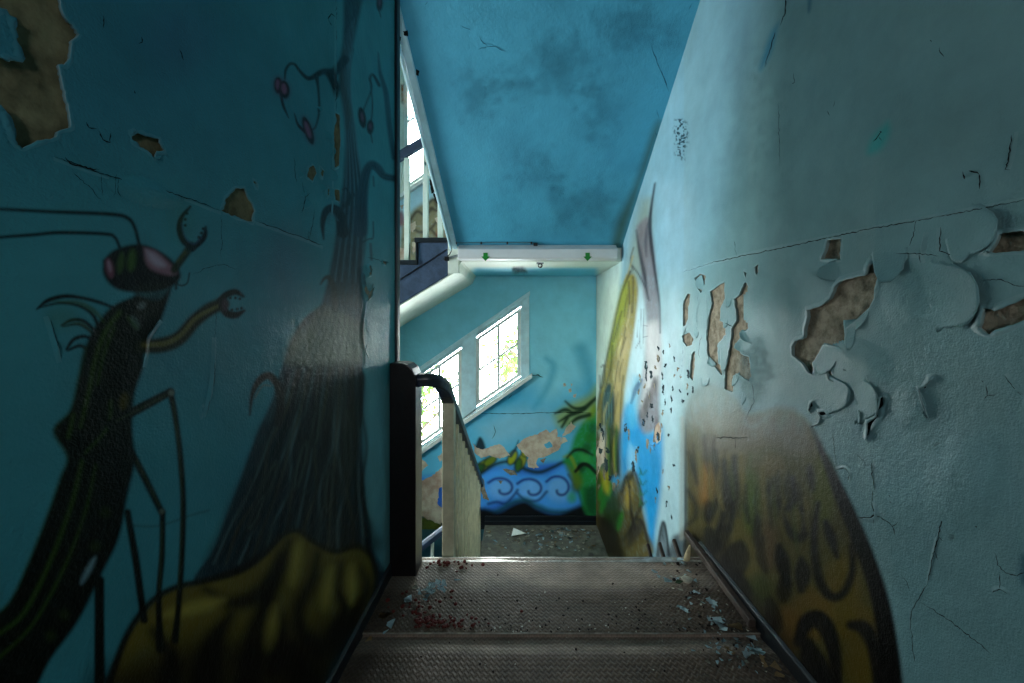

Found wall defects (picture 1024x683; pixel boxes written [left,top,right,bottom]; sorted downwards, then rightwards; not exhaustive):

peeling [0,0,82,152]
crack [53,157,122,199]
peeling [128,128,167,161]
peeling [219,177,259,226]
damp [674,119,688,159]
crack [683,171,1024,272]
peeling [931,204,1024,338]
peeling [624,263,760,473]
peeling [790,234,908,444]
peeling [472,422,577,501]
peeling [596,423,620,491]
crack [905,521,985,660]